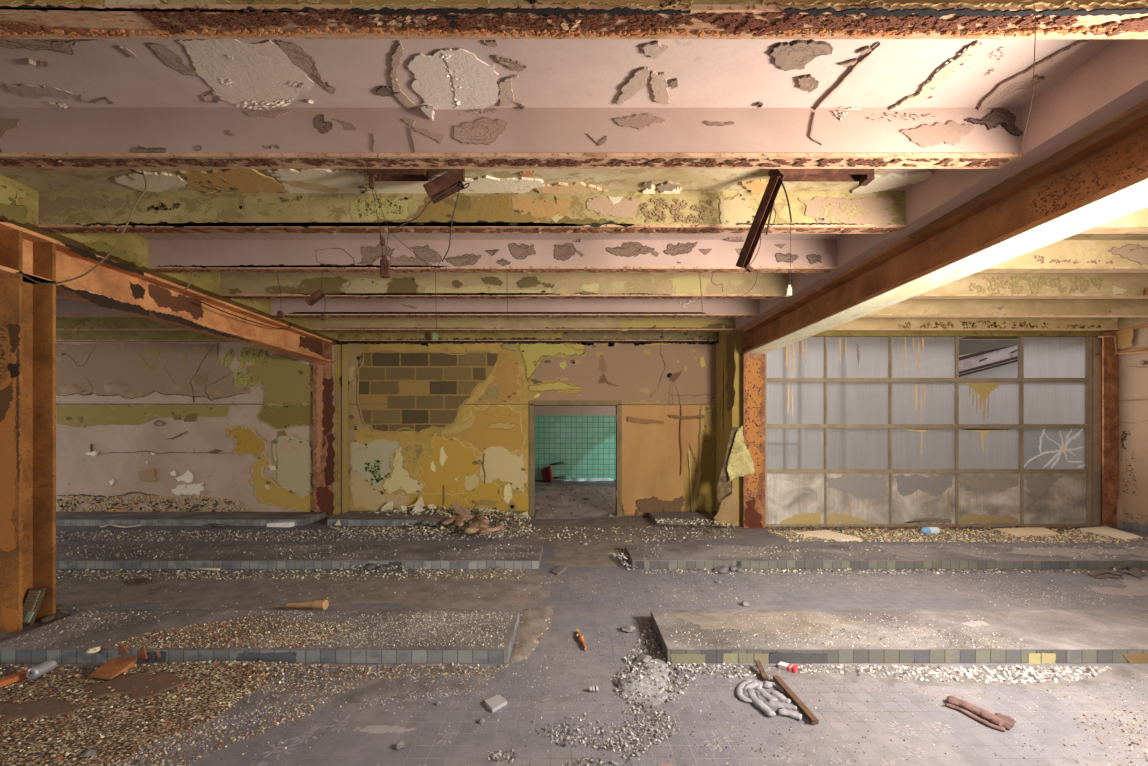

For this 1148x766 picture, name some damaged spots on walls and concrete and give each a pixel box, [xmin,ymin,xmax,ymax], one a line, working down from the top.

peeling [524,0,693,35]
peeling [760,0,1148,9]
rust [0,103,1148,342]
rust [0,323,22,552]
peeling [56,343,313,512]
rust [223,293,783,528]
peeling [327,269,755,511]
water stain [965,382,1002,401]
crack [1024,428,1085,469]
water stain [827,474,1019,500]
water stain [781,512,868,524]
water stain [905,513,1018,524]